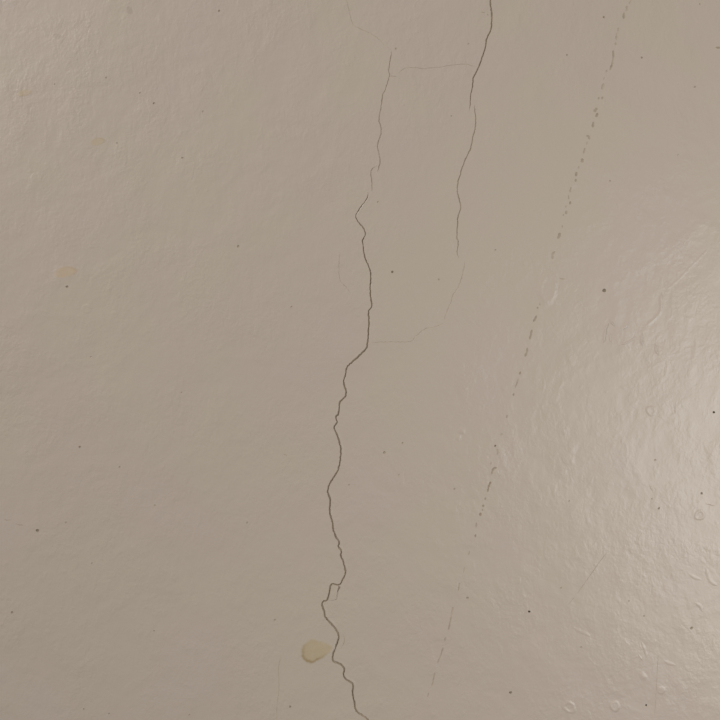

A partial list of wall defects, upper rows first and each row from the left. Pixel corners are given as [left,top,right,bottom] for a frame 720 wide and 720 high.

crack [321,0,493,720]